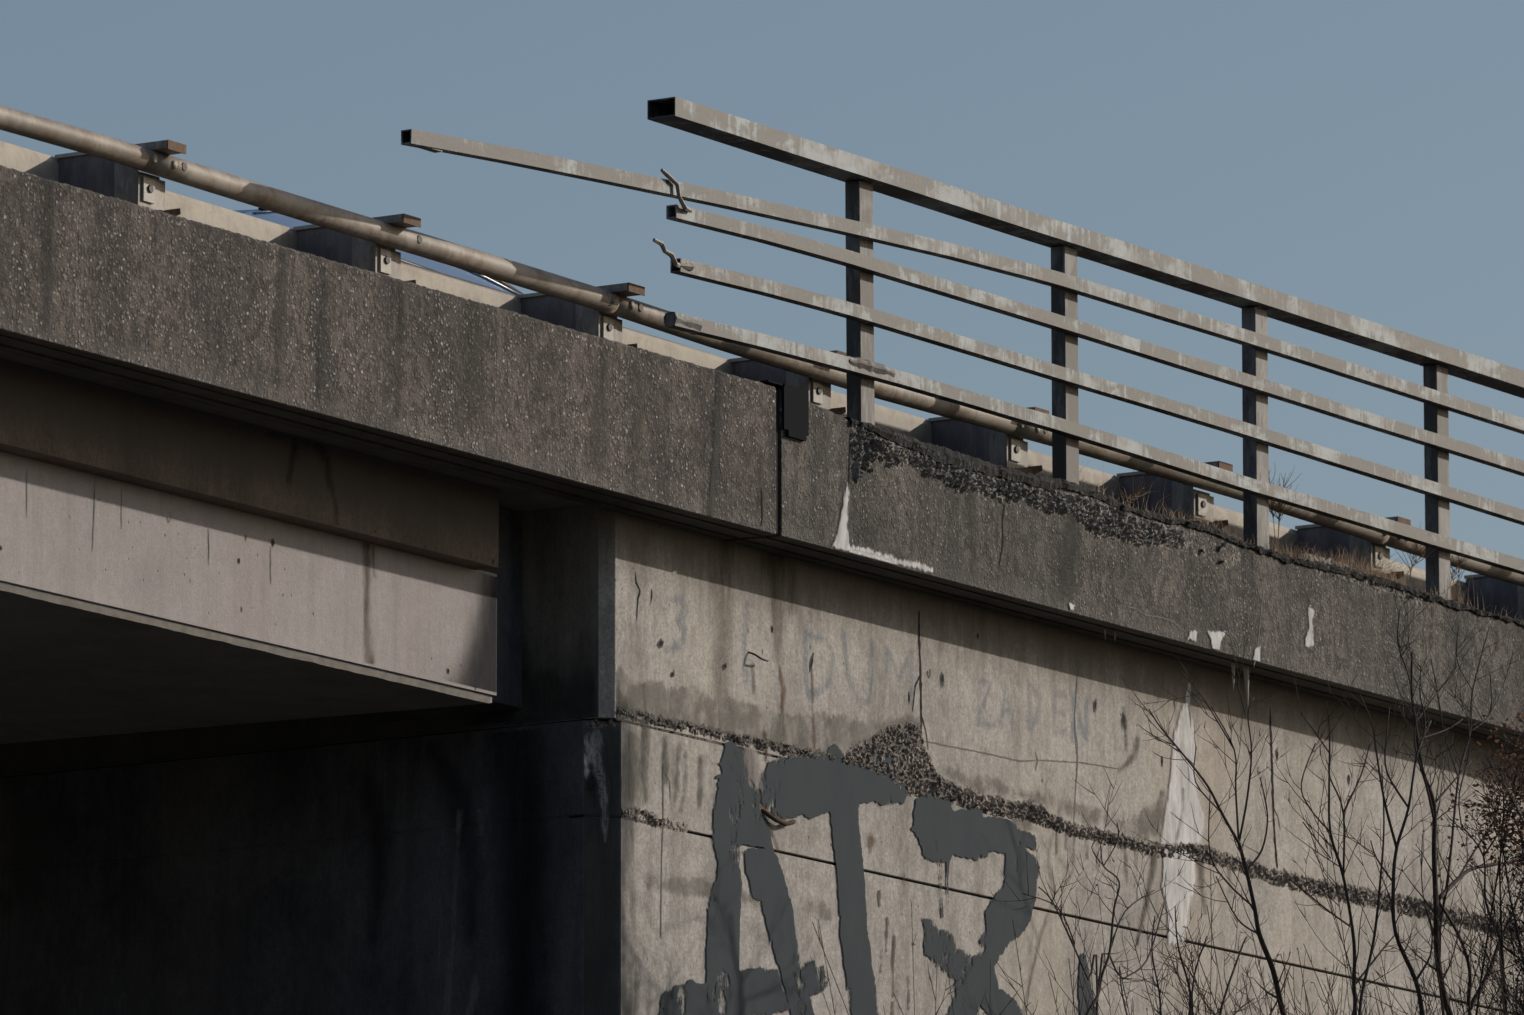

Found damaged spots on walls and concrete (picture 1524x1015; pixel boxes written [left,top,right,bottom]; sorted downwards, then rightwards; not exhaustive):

spalling [849,419,1240,567]
spalling [1304,553,1422,606]
spalling [616,691,1519,940]